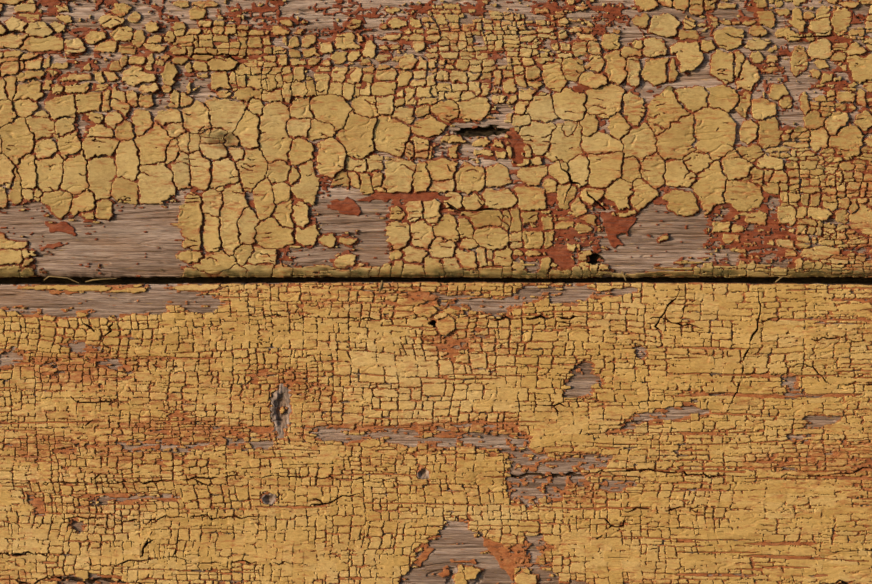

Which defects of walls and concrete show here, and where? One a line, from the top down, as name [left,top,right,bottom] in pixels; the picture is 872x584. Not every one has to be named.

peeling [0,0,872,324]
crack [476,315,589,324]
crack [650,288,701,330]
peeling [561,355,606,402]
crack [722,295,781,419]
peeling [608,399,711,436]
crack [61,474,238,486]
peeling [291,413,644,512]
crack [511,468,725,478]
crack [18,514,248,584]
peeling [393,515,610,584]
peeling [0,565,131,584]